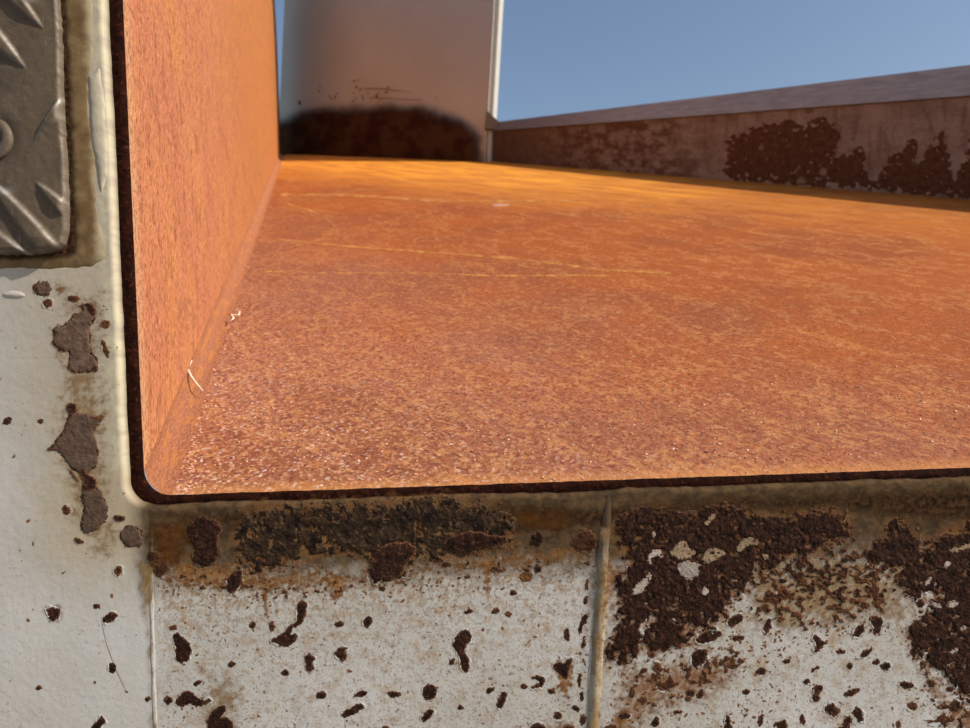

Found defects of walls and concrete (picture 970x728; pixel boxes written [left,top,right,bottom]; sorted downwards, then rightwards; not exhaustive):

corrosion [722,108,970,199]
peeling [32,280,54,310]
peeling [52,294,111,374]
peeling [47,403,144,548]